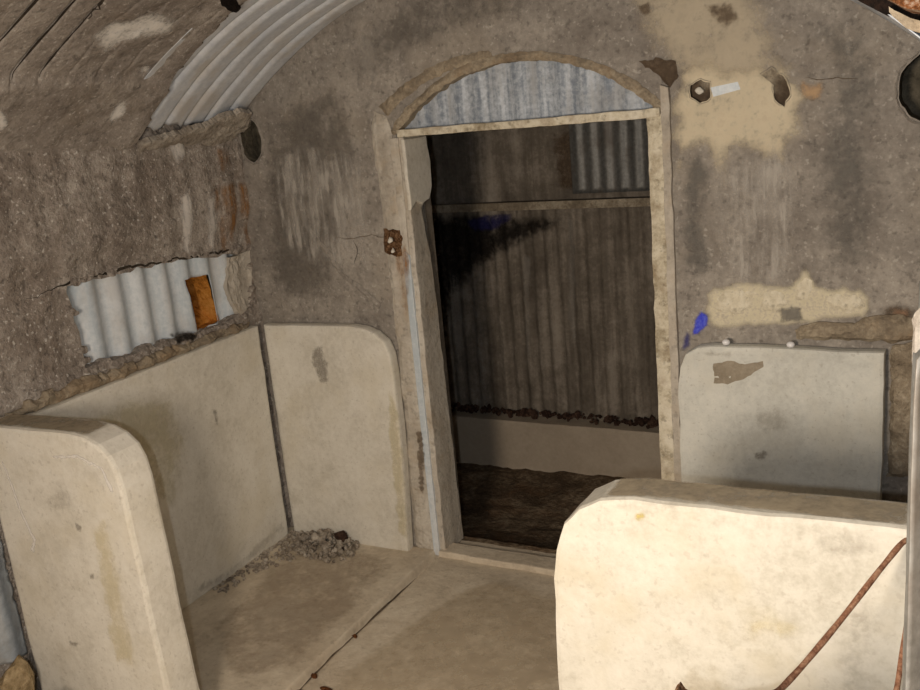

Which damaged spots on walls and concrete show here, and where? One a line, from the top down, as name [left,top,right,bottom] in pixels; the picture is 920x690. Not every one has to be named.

peeling [635,0,821,164]
corrosion [858,0,920,33]
damp [277,107,362,287]
spalling [4,244,257,416]
spalling [713,361,764,384]
peeling [705,271,869,328]